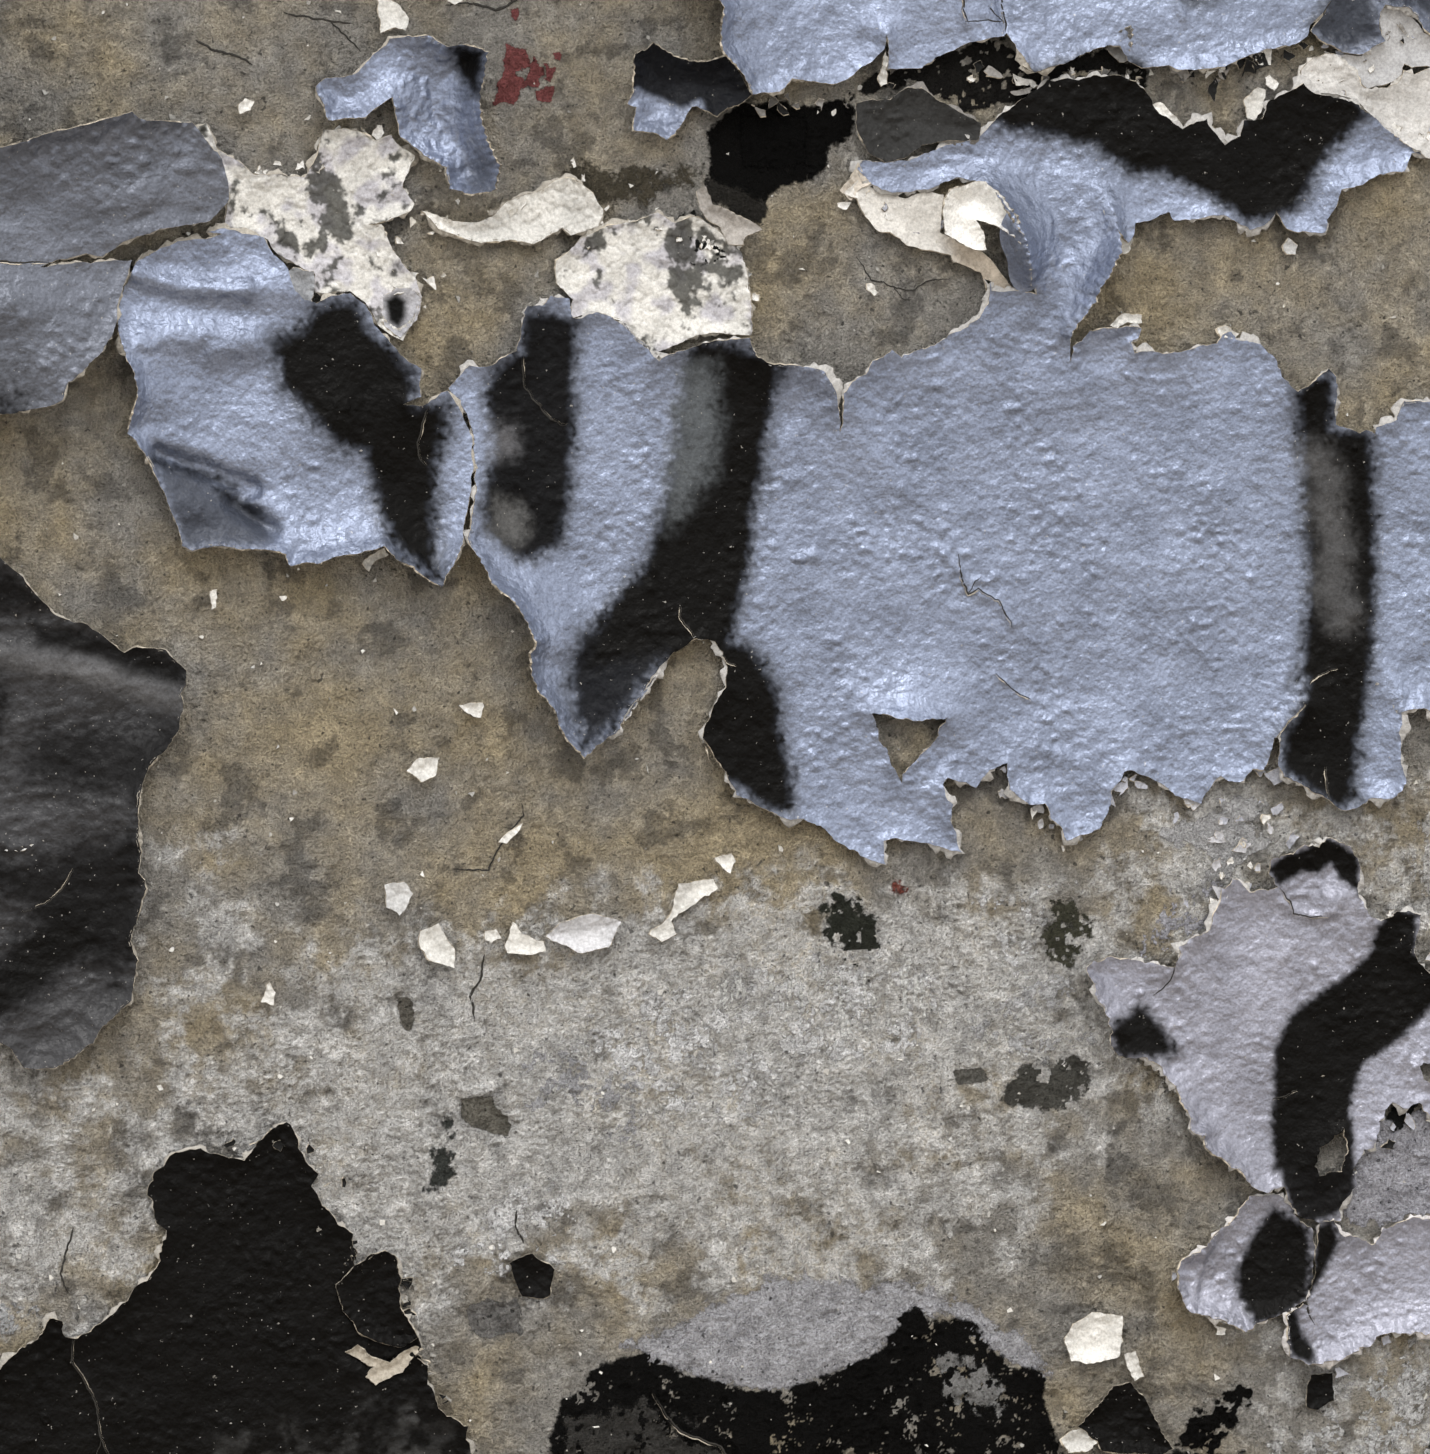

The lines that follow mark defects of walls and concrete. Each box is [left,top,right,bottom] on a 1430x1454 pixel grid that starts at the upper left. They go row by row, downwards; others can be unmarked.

crack [445,0,517,12]
peeling [0,0,1430,867]
peeling [0,558,187,1070]
peeling [384,881,413,916]
peeling [418,923,455,969]
peeling [484,913,621,955]
peeling [648,853,736,942]
spalling [460,1096,511,1136]
peeling [1086,799,1430,1410]
peeling [0,1122,476,1454]
spalling [466,1253,555,1338]
peeling [1059,1312,1173,1454]